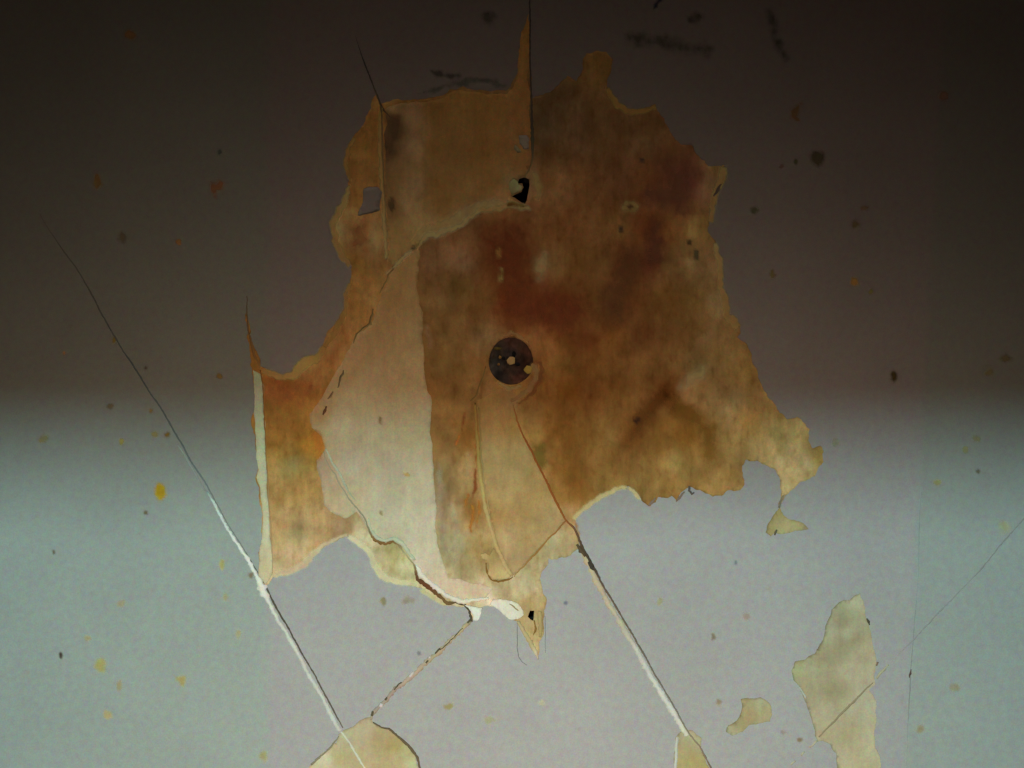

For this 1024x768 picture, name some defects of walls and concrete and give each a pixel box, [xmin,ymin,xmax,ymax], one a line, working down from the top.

crack [524,0,534,178]
peeling [245,14,824,660]
crack [40,215,344,732]
crack [323,449,473,721]
crack [513,405,712,768]
peeling [309,717,421,768]
peeling [674,730,709,768]
peeling [726,697,772,736]
peeling [792,593,881,768]